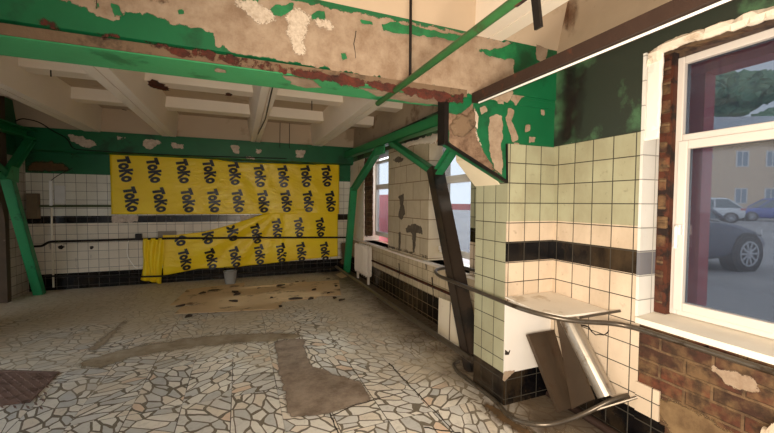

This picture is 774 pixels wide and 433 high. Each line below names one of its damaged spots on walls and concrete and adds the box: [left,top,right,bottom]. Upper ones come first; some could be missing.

peeling [536,44,548,61]
peeling [61,0,536,175]
rust [145,41,464,104]
peeling [711,365,760,393]
peeling [660,399,732,433]